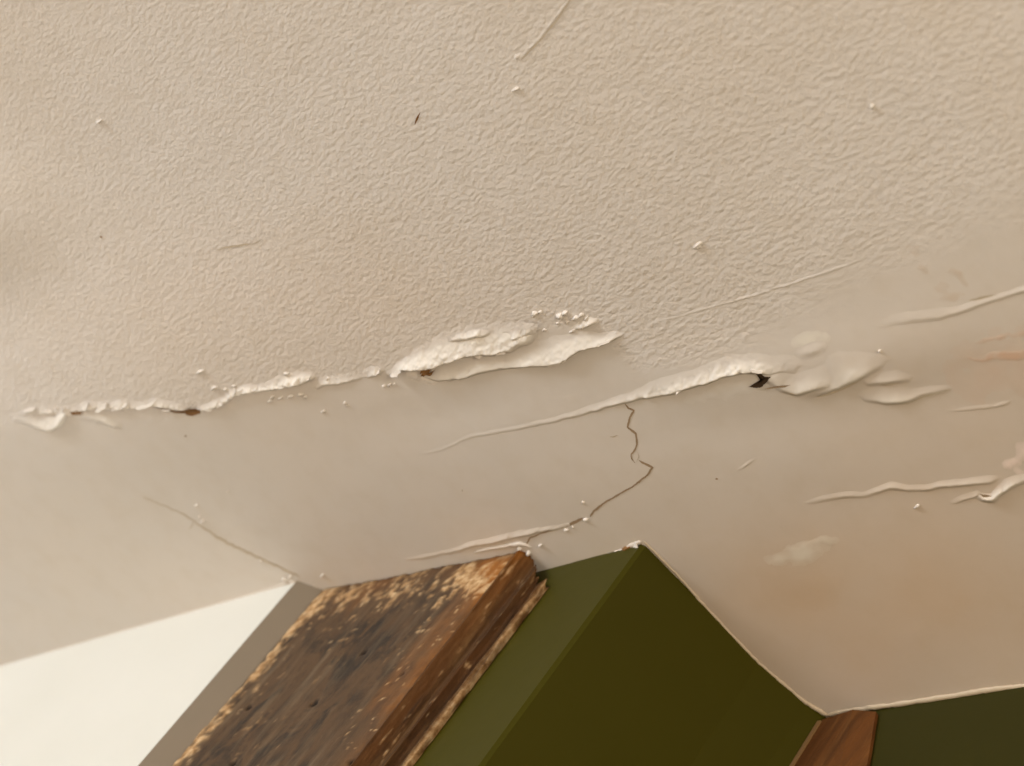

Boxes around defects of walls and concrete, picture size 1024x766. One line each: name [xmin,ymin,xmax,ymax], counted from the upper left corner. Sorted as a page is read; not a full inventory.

peeling [542,311,599,333]
peeling [10,366,396,433]
peeling [416,349,952,455]
crack [526,404,653,544]